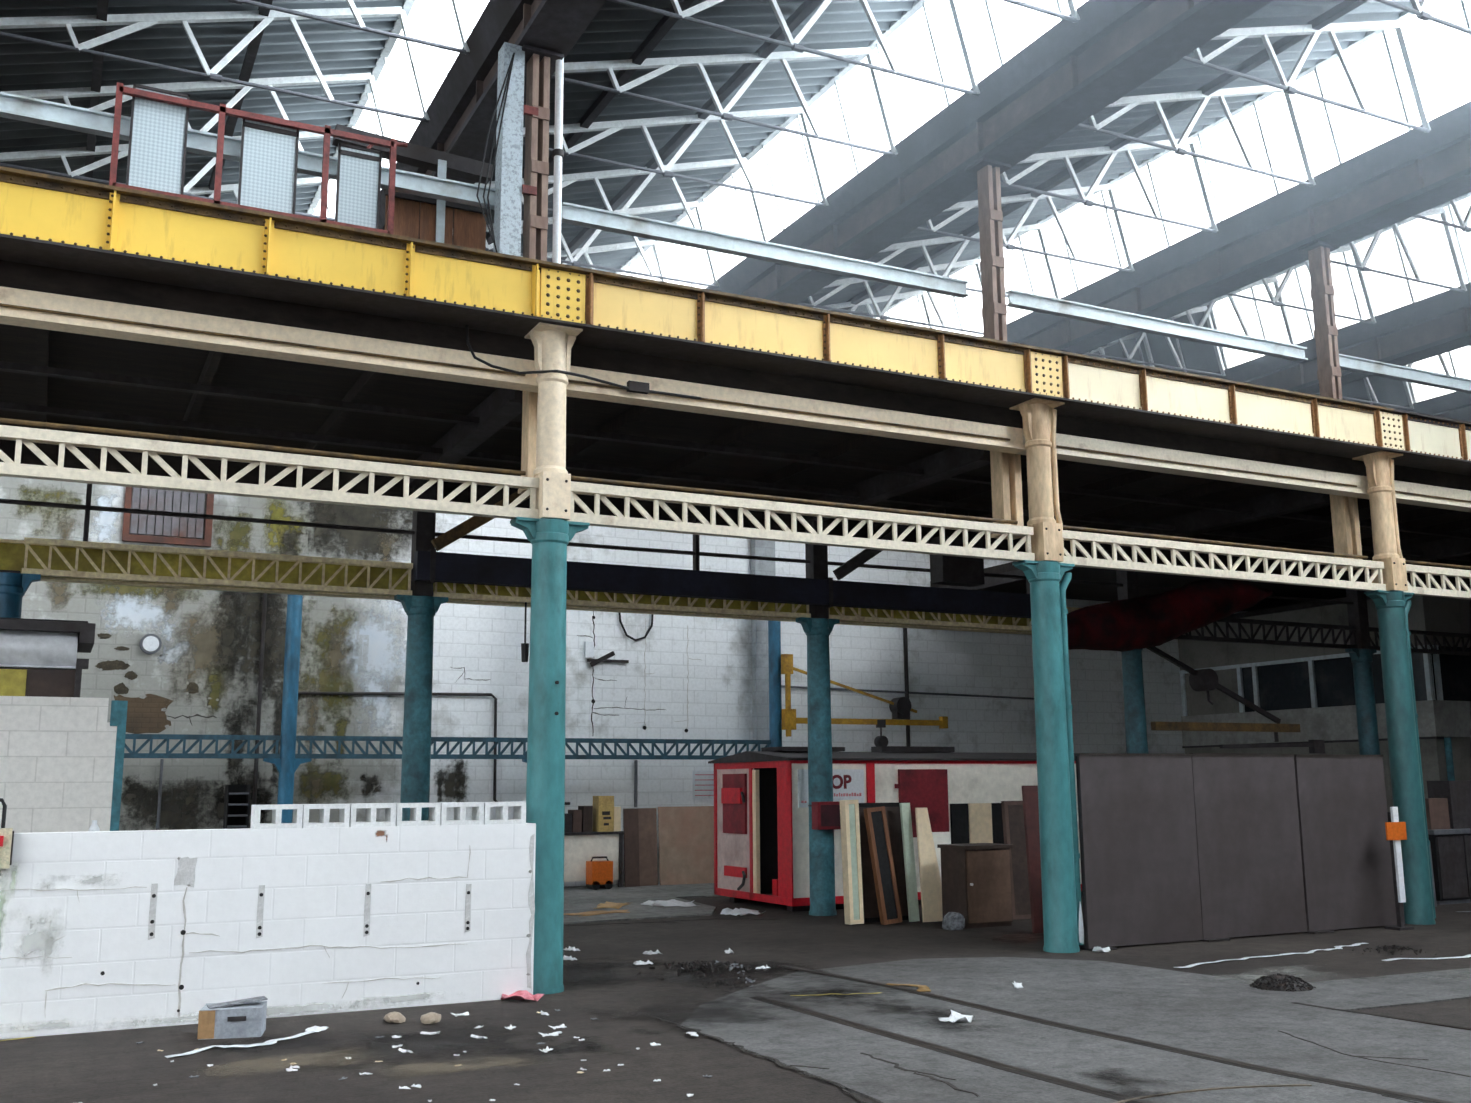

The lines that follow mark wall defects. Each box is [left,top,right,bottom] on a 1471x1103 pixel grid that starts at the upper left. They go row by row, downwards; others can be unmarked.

water stain [59,519,73,540]
water stain [215,513,252,551]
water stain [274,501,413,562]
water stain [50,582,70,607]
spalling [95,595,219,734]
water stain [120,588,319,831]
water stain [335,717,349,754]
crack [380,851,471,882]
crack [0,886,454,1021]